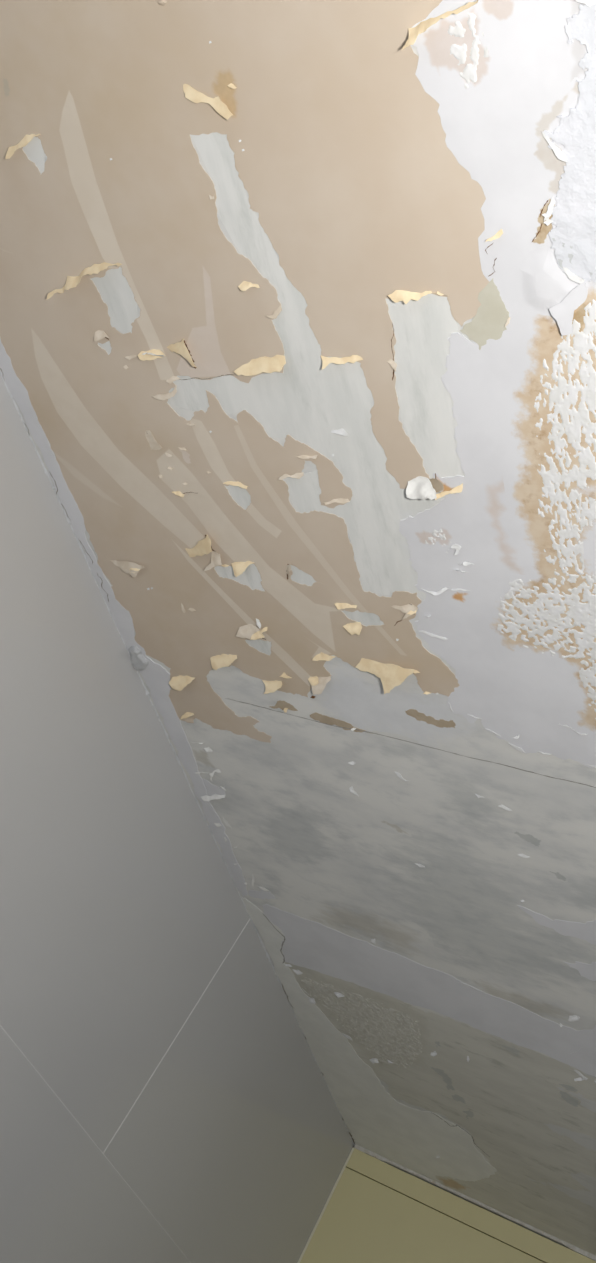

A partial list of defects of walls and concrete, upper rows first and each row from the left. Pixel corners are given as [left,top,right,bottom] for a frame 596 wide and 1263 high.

peeling [530,0,596,284]
peeling [0,0,518,743]
damp [478,277,596,743]
damp [245,788,351,875]
damp [297,731,596,1026]